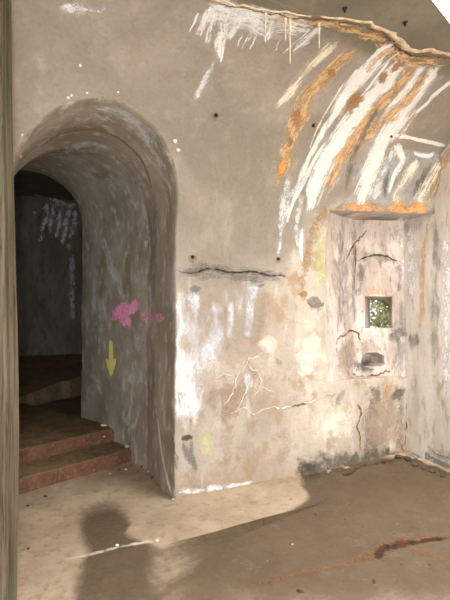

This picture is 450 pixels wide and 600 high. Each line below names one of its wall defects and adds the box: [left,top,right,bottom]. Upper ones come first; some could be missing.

leakage [189,0,321,99]
corrosion [276,49,358,183]
crack [175,264,285,287]
crack [347,230,401,292]
corrosion [317,147,450,327]
crack [211,352,336,434]
spalling [336,329,390,378]
leakage [76,382,450,600]
corrosion [252,535,448,586]